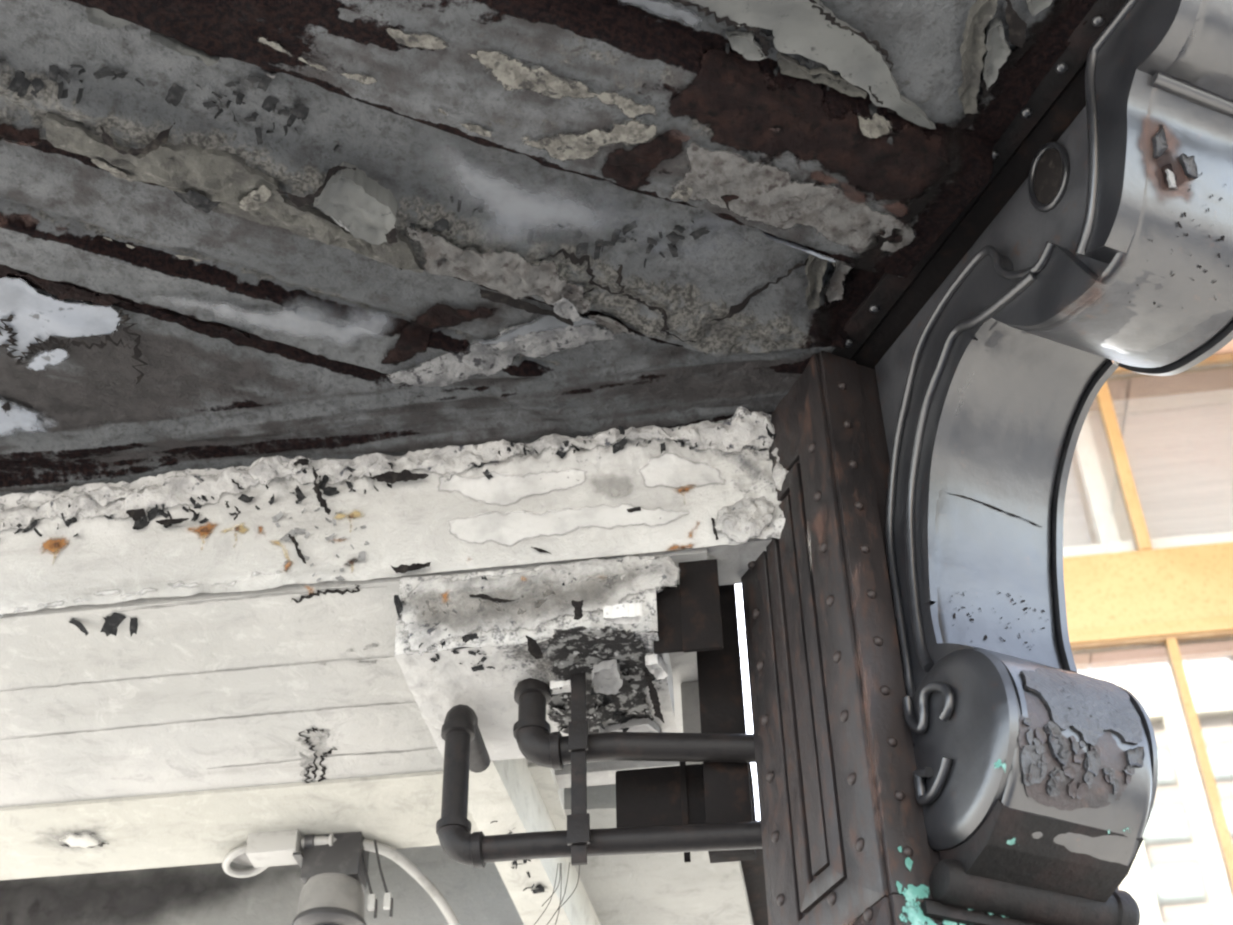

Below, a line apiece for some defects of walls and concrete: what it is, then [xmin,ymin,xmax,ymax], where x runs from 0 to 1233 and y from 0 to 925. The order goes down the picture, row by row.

peeling [86,7,136,29]
peeling [619,0,936,129]
flaking render [7,64,591,326]
peeling [558,220,710,267]
flaking render [671,142,916,309]
corrosion [1140,118,1199,199]
peeling [0,277,121,371]
crack [545,248,809,342]
peeling [0,401,44,436]
spalling [0,411,789,734]
peeling [1018,667,1145,811]
peeling [899,884,966,925]